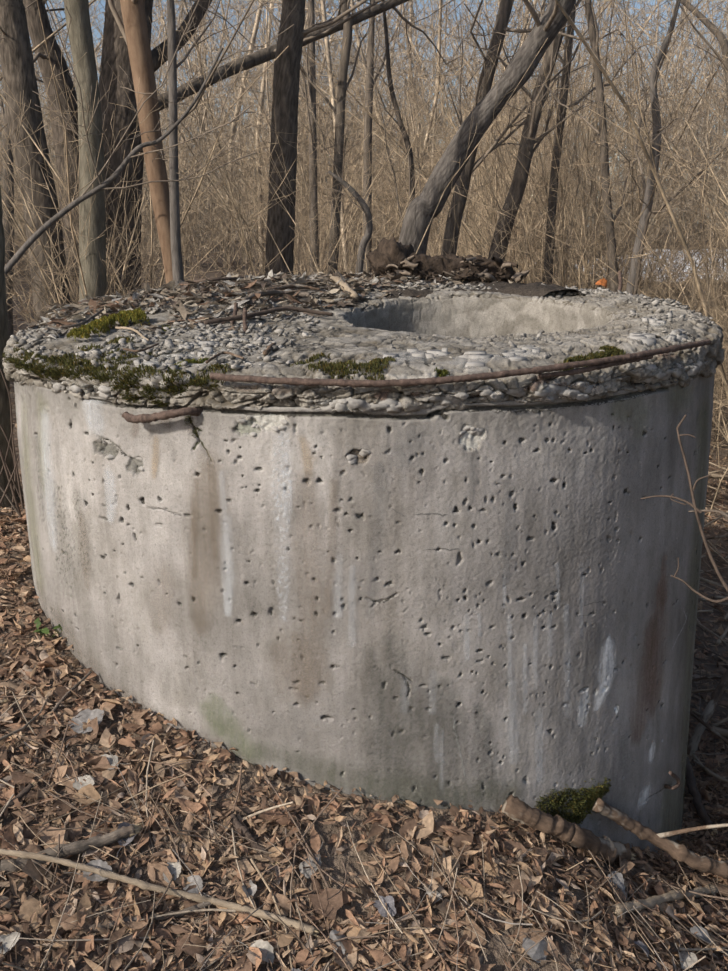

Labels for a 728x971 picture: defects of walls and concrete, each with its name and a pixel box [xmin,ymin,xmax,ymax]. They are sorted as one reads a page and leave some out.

spalling [85,432,119,463]
spalling [127,457,144,474]
peeling [460,425,493,463]
leakage [596,637,613,710]